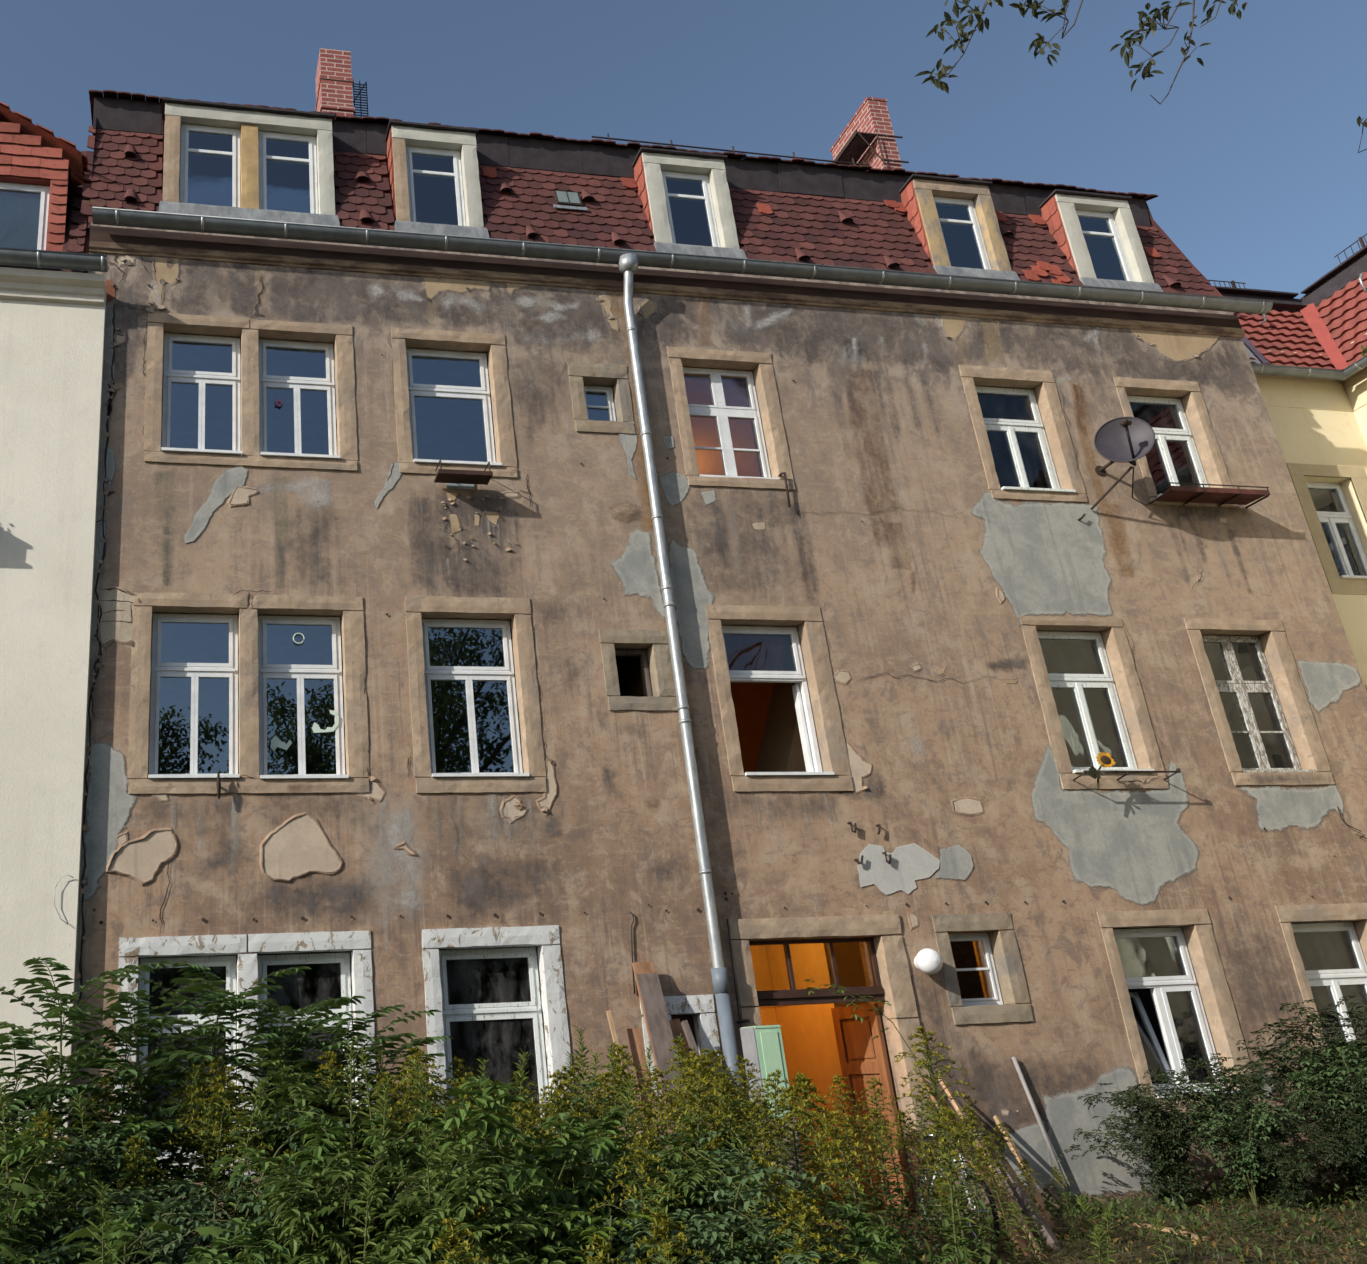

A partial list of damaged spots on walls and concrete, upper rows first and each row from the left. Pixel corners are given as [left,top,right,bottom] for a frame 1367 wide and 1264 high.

flaking render [1126,319,1221,363]
flaking render [227,486,260,508]
crack [91,588,135,717]
flaking render [74,255,181,1009]